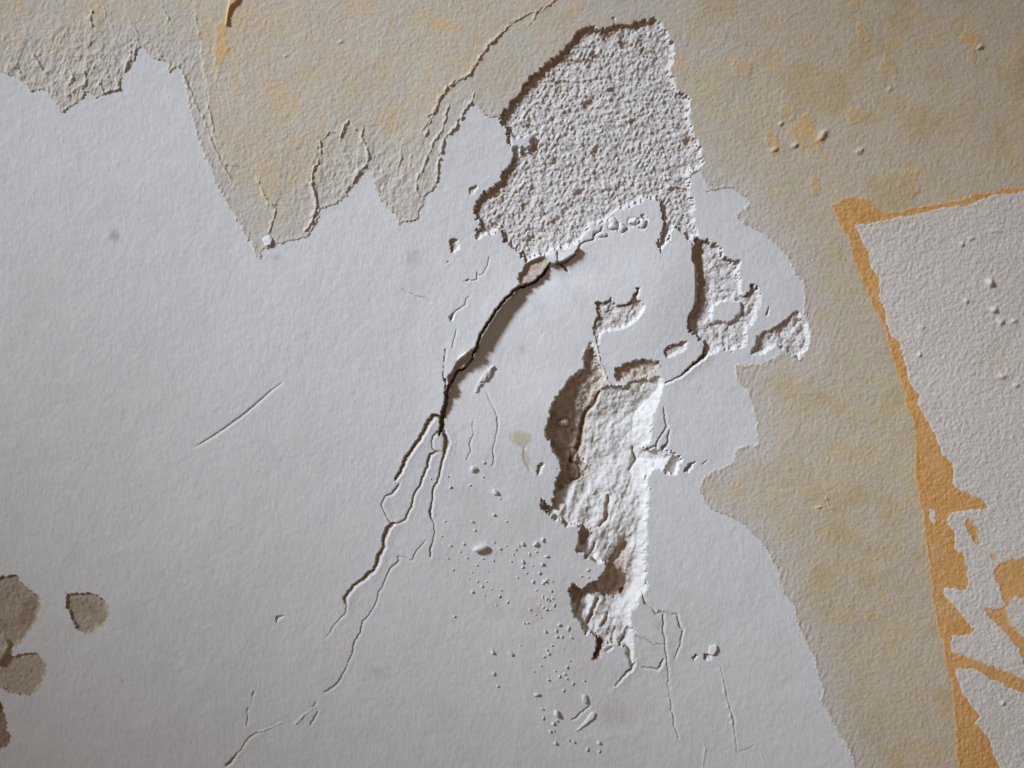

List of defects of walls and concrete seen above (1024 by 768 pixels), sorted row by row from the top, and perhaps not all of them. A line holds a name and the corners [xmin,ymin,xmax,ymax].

crack [310,227,603,726]
flaking render [469,17,812,668]
crack [226,690,259,767]